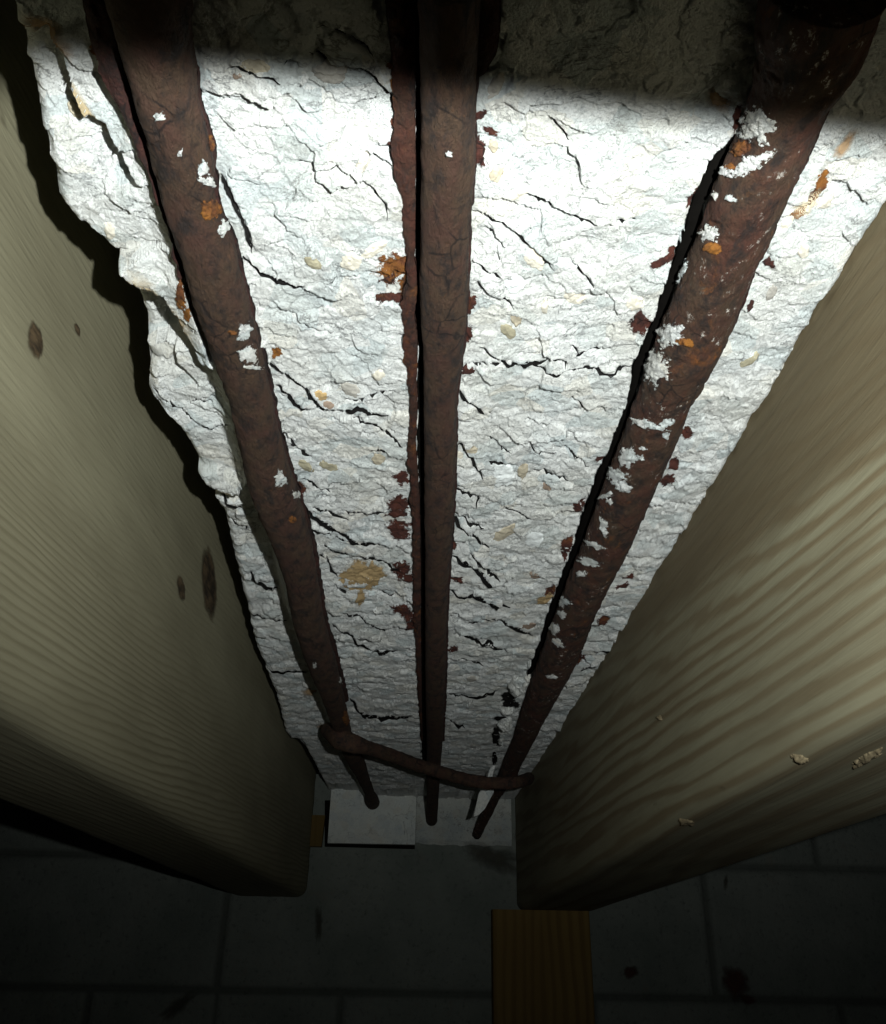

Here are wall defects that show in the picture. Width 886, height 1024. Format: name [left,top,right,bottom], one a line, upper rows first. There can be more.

rust [476,109,500,167]
crack [221,174,335,334]
rust [370,251,407,307]
rust [650,245,676,269]
rust [628,310,655,336]
crack [154,388,227,430]
crack [267,0,498,761]
spalling [15,0,886,826]
crack [451,134,736,676]
rust [383,471,412,541]
crack [250,571,277,590]
spalling [472,788,522,839]